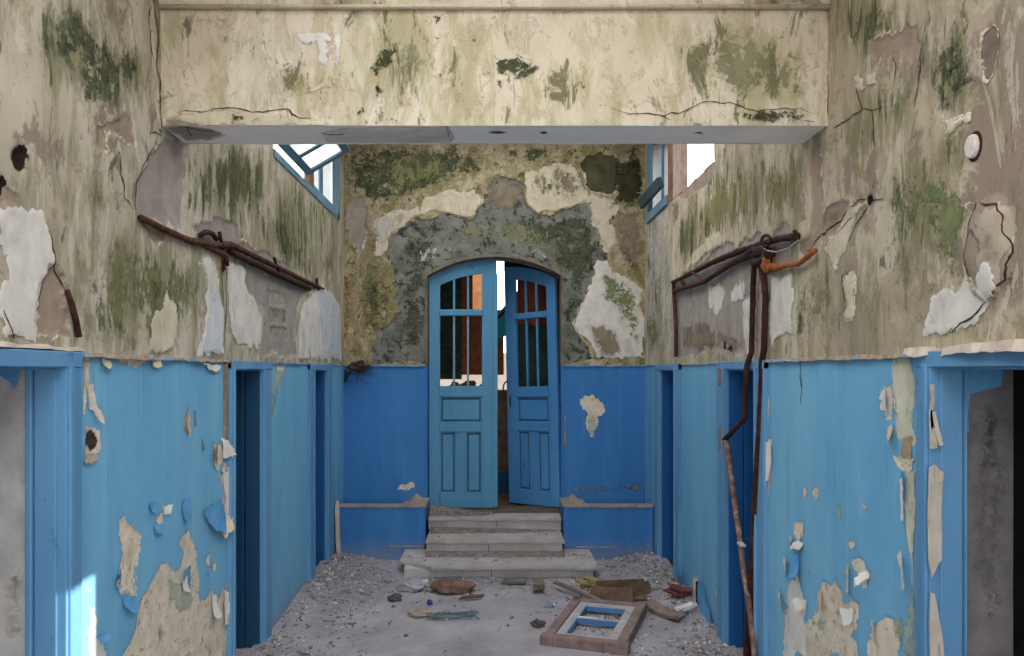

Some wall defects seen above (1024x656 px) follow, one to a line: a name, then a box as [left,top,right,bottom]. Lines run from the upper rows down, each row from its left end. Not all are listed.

crack [149,0,309,135]
crack [615,76,882,146]
peeling [0,175,178,464]
corrosion [137,214,325,291]
peeling [116,109,454,656]
spalling [345,152,644,364]
peeling [579,393,605,437]
corrosion [671,229,818,357]
peeling [778,262,1024,656]
peeling [87,607,112,656]